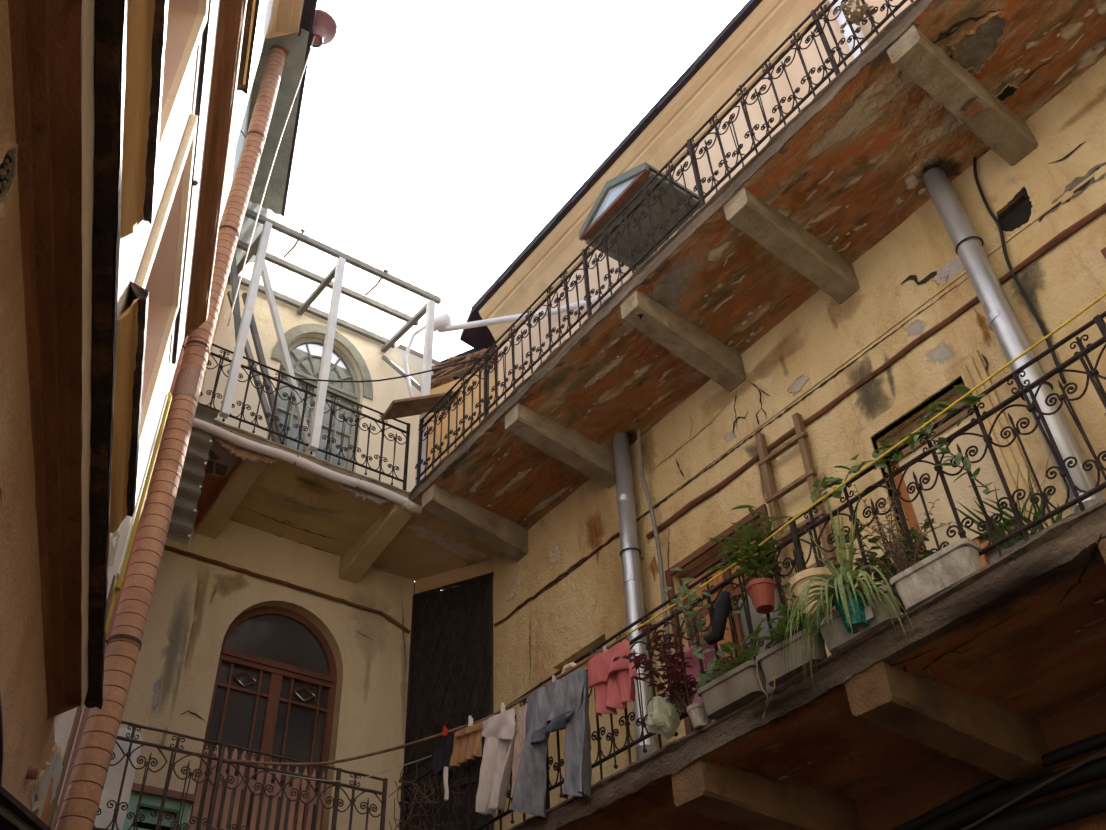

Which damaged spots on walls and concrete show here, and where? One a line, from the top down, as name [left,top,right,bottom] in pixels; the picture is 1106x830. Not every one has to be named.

crack [1048,141,1086,164]
peeling [699,232,789,349]
flaking render [931,255,965,287]
leakage [851,358,894,414]
crack [517,271,969,682]